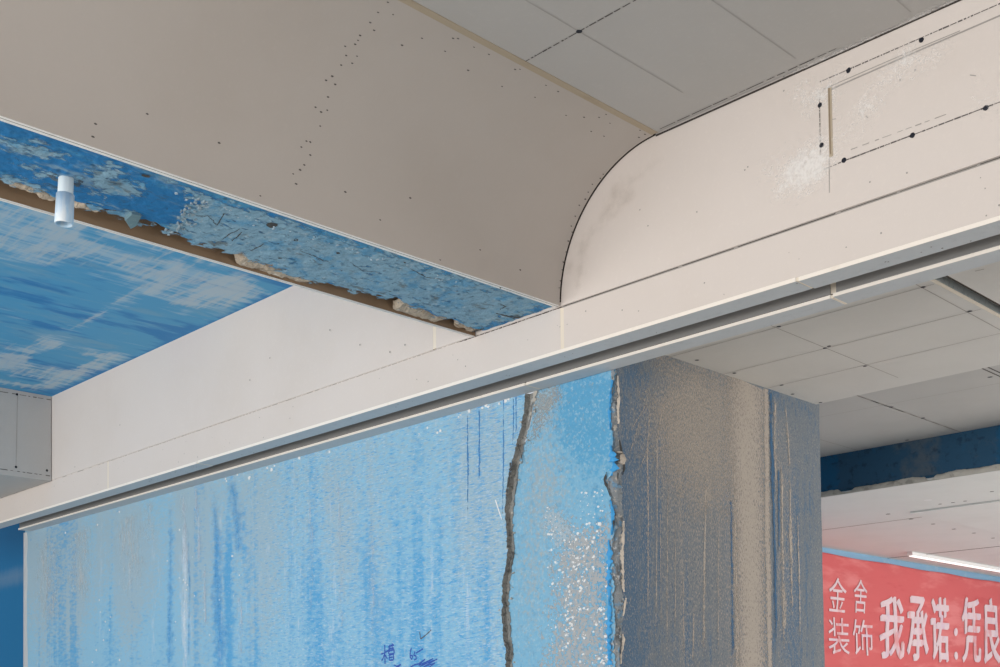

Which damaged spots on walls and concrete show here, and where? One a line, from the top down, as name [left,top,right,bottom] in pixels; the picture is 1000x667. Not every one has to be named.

peeling [0,135,70,192]
peeling [74,161,549,327]
crack [498,391,537,667]
peeling [538,369,627,667]